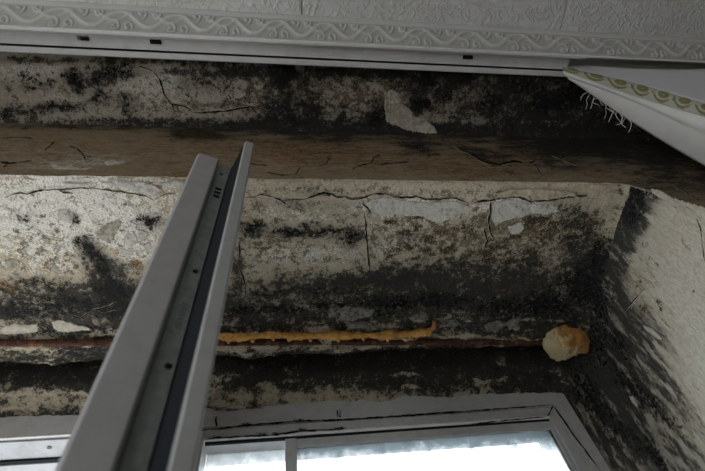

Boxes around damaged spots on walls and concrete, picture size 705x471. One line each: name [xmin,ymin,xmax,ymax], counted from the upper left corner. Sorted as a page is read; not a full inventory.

leakage [8,64,91,93]
crack [138,65,271,116]
peeling [384,90,437,134]
crack [0,160,32,168]
crack [6,187,174,200]
peeling [371,196,469,223]
leakage [618,186,657,229]
crack [249,191,587,272]
leakage [0,237,134,338]
peeling [0,323,39,335]
peeling [52,320,90,333]
leakage [202,211,687,471]